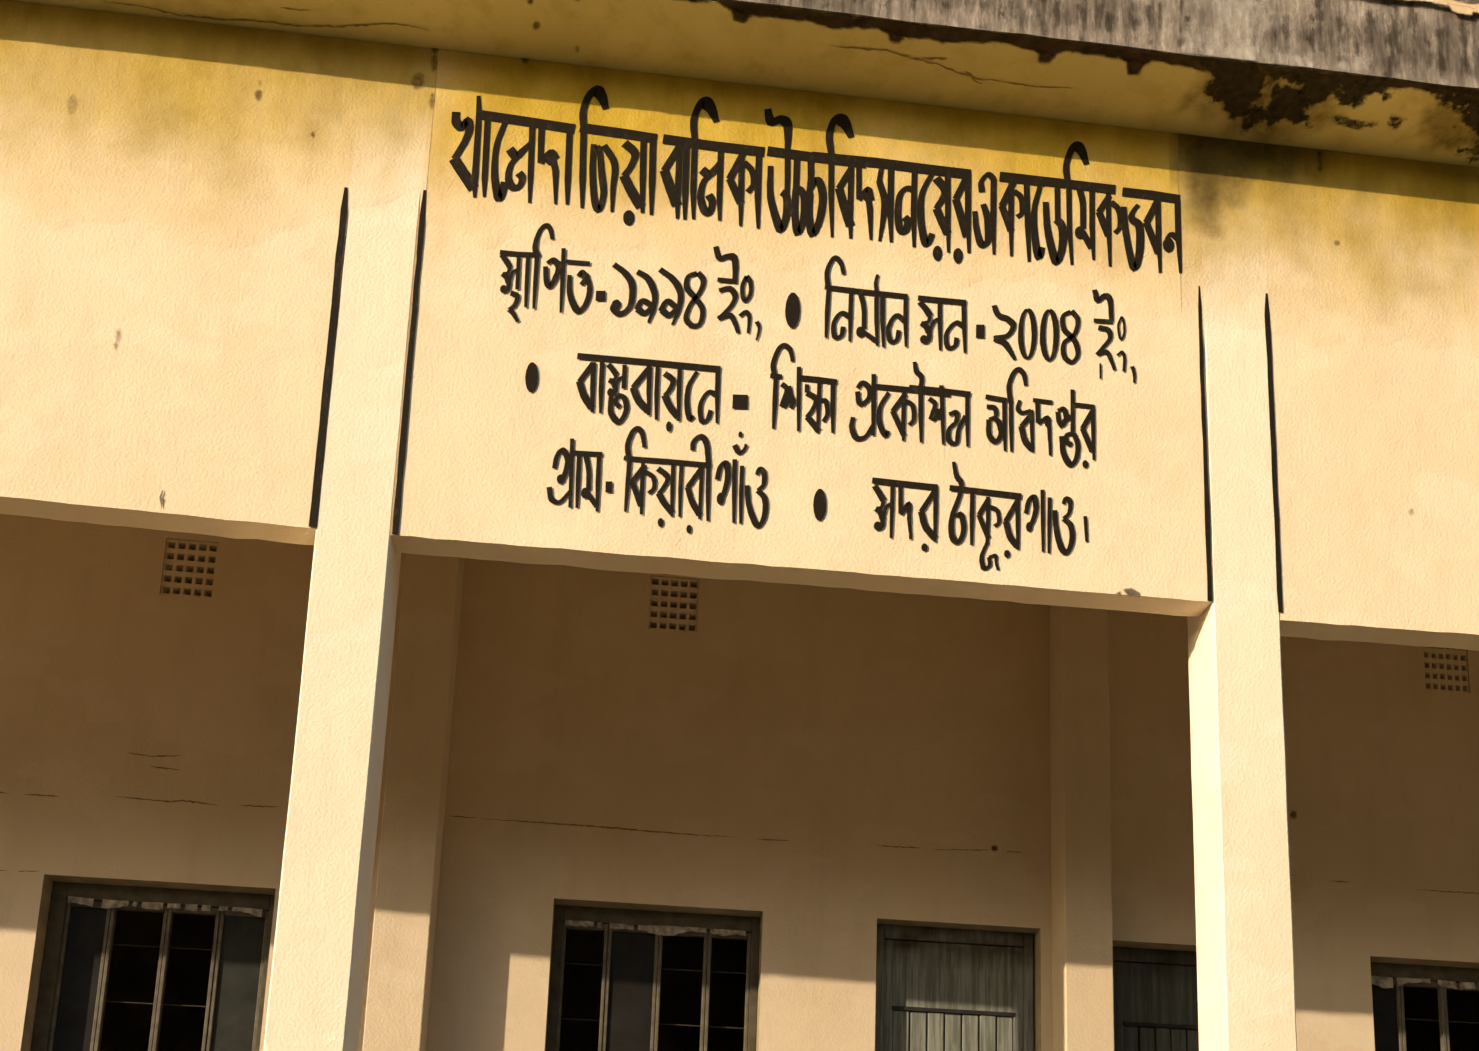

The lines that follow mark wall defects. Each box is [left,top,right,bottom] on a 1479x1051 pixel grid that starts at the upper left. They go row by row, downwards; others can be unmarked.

leakage [0,0,1479,358]
crack [0,790,60,798]
crack [116,753,278,807]
crack [453,816,788,841]